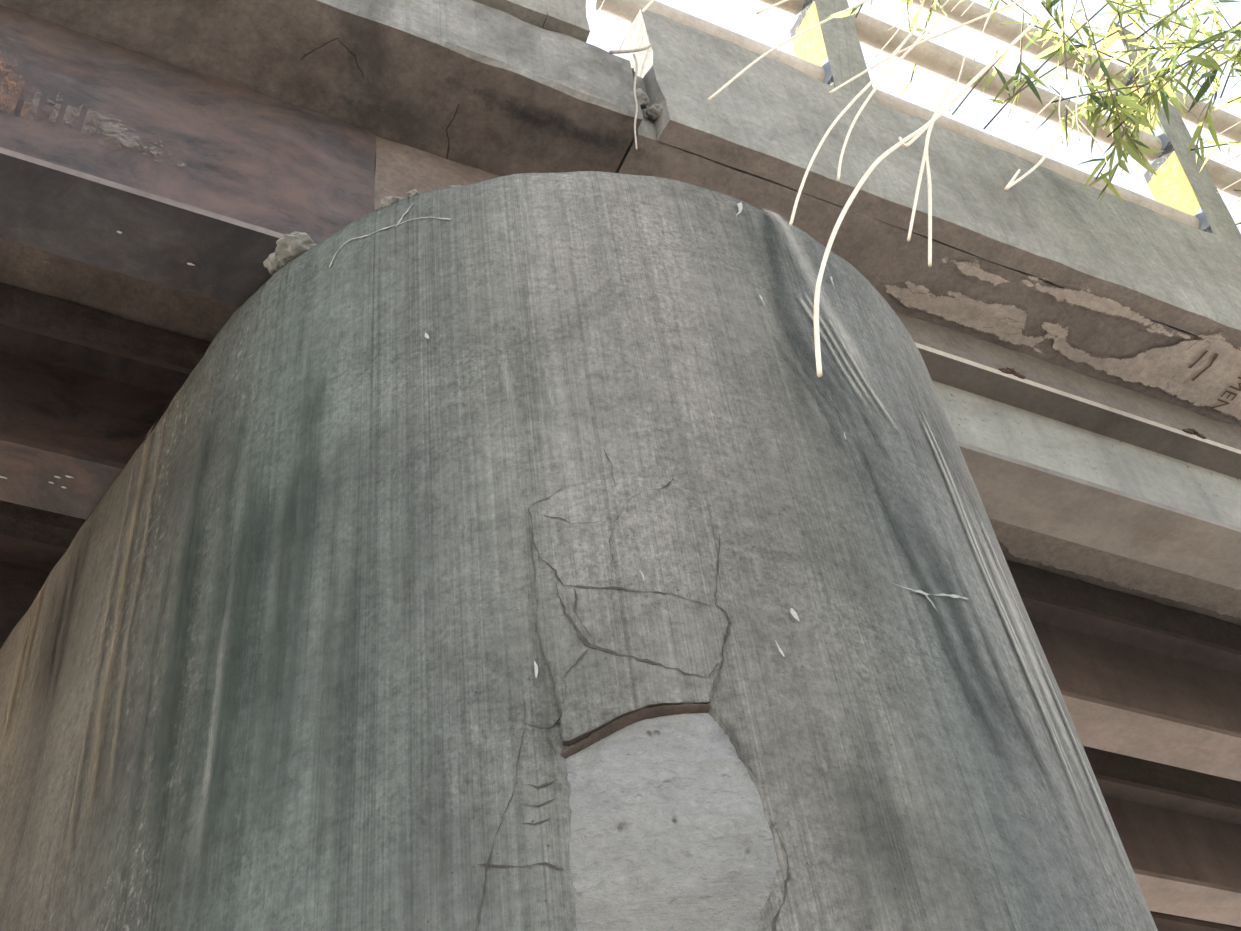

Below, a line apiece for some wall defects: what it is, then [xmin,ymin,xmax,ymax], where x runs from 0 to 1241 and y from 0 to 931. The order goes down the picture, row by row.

peeling [885,258,1241,420]
crack [476,447,757,929]
spalling [562,703,778,931]
crack [771,822,791,931]